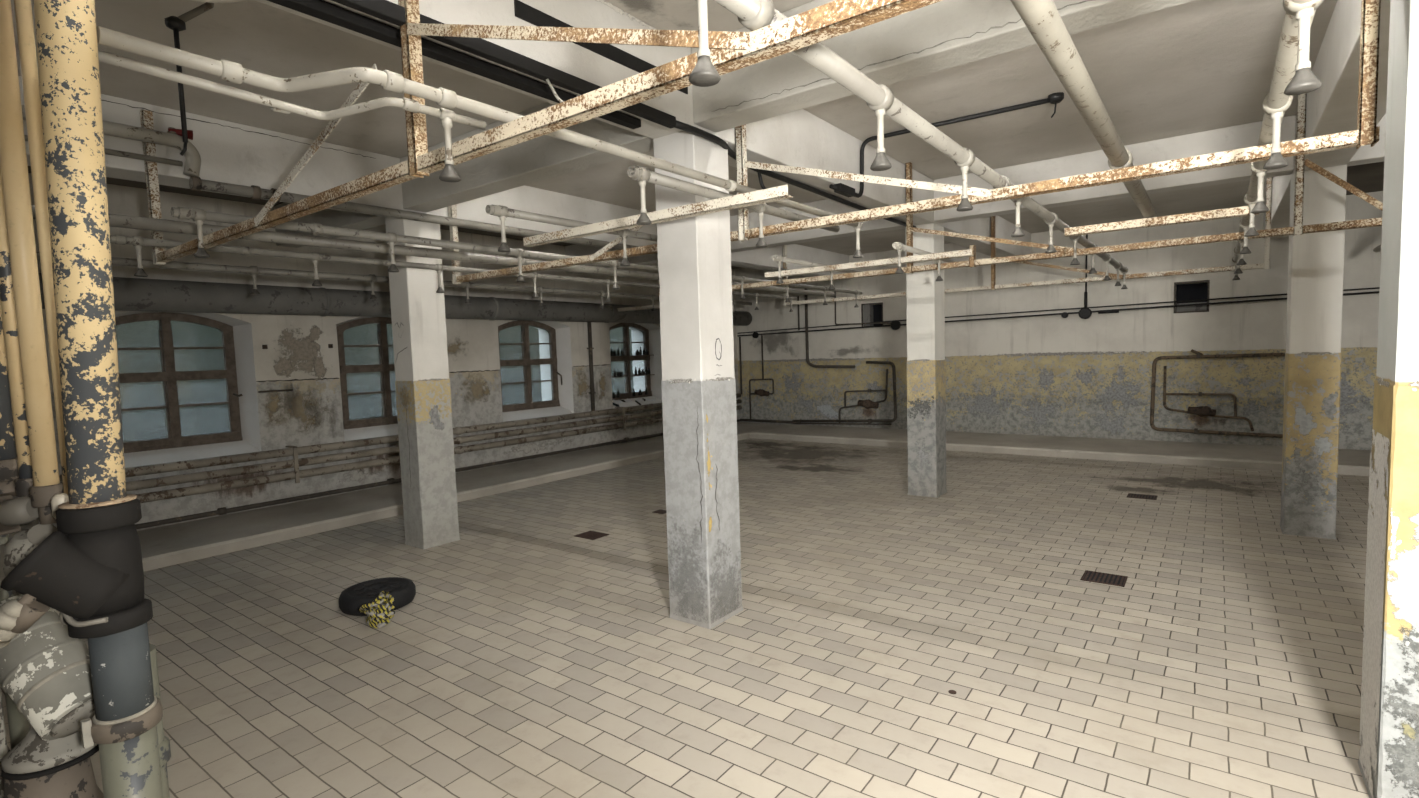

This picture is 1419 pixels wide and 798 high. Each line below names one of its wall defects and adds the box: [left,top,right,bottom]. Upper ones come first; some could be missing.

peeling [274,321,329,381]
water stain [1115,477,1264,495]
peeling [1290,372,1370,506]
peeling [1359,429,1419,798]